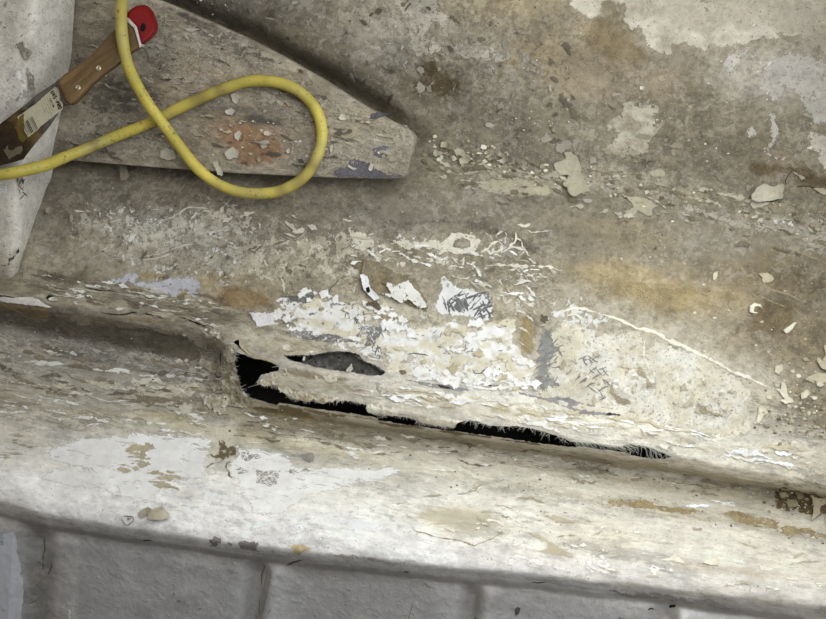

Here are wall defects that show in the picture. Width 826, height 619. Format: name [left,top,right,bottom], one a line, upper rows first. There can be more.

damp [588,16,645,64]
damp [790,168,826,188]
peeling [0,197,826,467]
crack [208,339,677,468]
peeling [0,327,640,519]
peeling [334,554,405,566]
peeling [565,542,616,574]
peeling [649,553,685,577]
peeling [610,590,729,610]